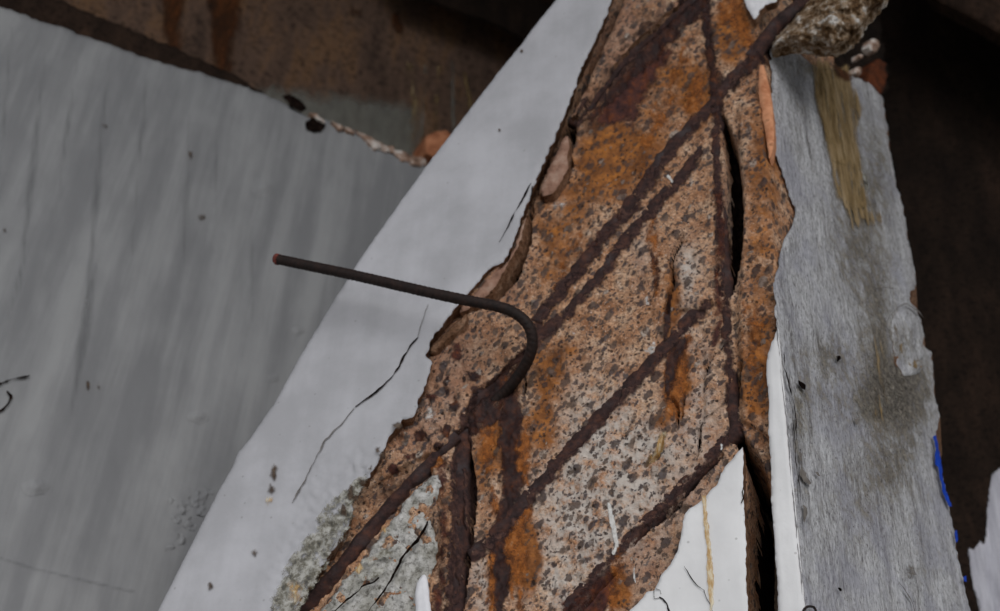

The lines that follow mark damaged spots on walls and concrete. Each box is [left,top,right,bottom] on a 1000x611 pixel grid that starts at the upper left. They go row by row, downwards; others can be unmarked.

crack [555,80,590,152]
corrosion [584,0,768,153]
crack [499,183,538,242]
crack [726,138,744,290]
crack [292,305,428,503]
corrosion [426,375,460,412]
spalling [266,0,809,611]
corrosion [645,219,693,418]
crack [335,521,428,611]
corrosion [414,424,452,557]
corrosion [467,361,533,611]
corrosion [702,496,714,610]